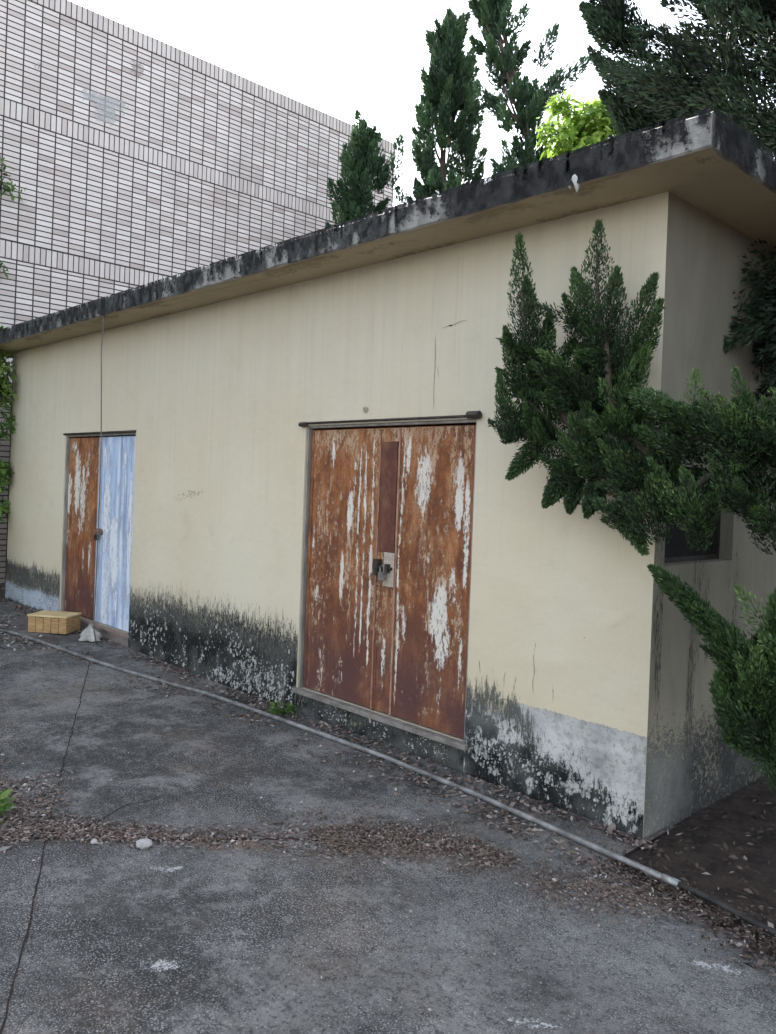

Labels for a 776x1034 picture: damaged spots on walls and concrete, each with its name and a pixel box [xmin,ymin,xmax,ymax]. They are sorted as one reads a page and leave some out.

damp [0,107,776,343]
damp [5,554,60,611]
crack [0,653,93,1034]
crack [97,795,429,843]
damp [128,582,774,839]